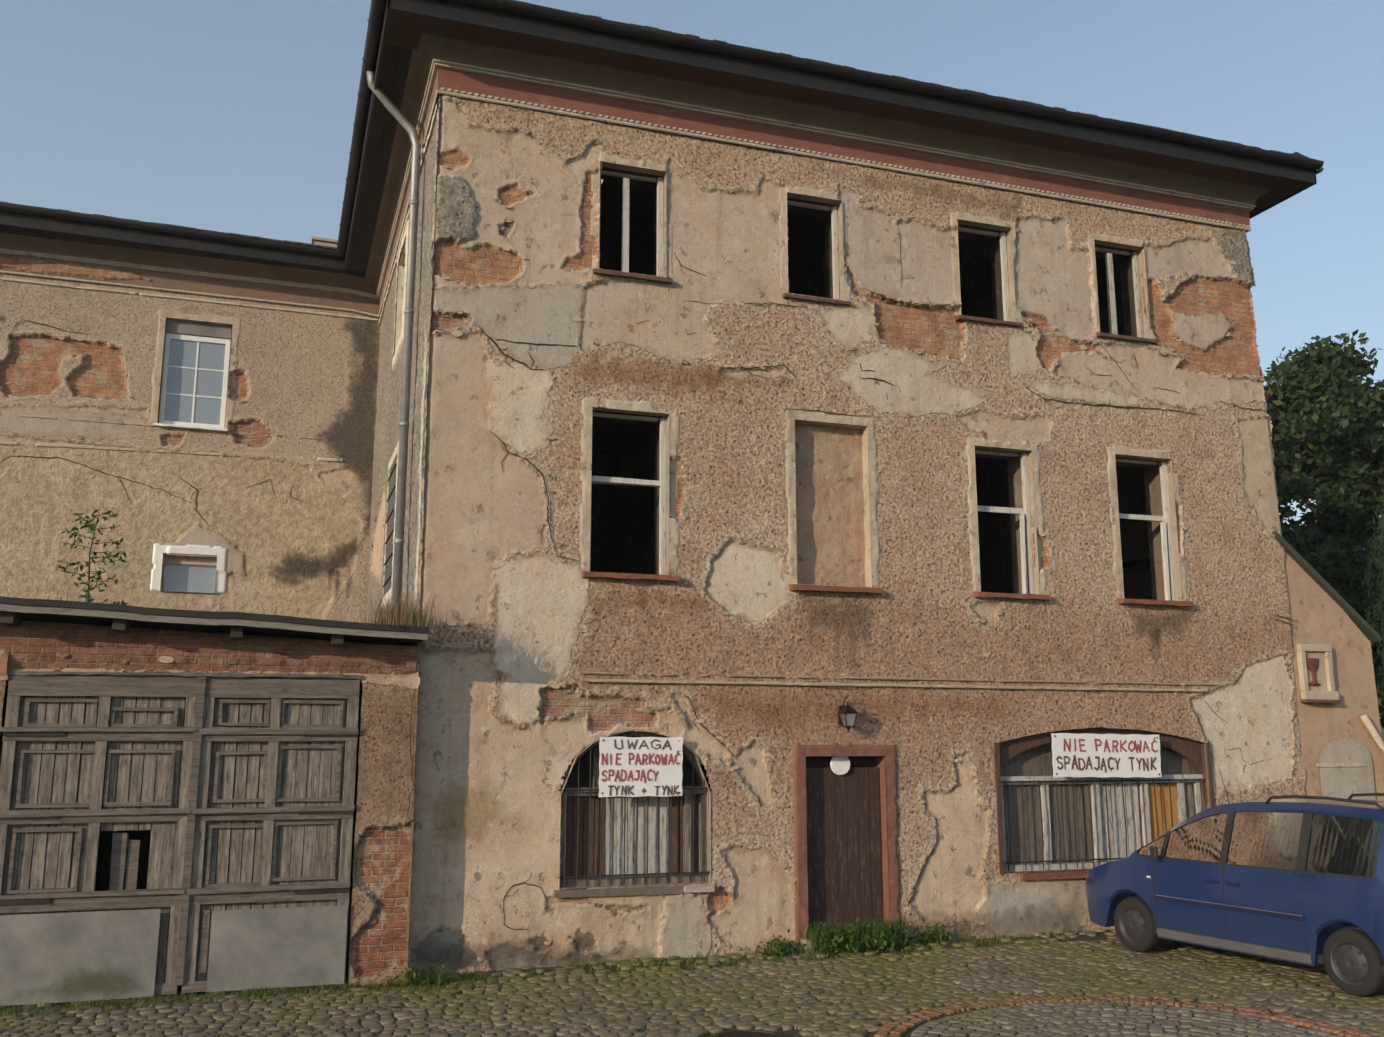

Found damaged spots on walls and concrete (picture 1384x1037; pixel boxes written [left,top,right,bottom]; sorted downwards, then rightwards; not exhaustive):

crack [0,452,209,526]
peeling [0,335,386,619]
damp [318,316,380,521]
crack [489,430,578,561]
peeling [428,99,791,379]
crack [720,349,897,416]
peeling [838,184,965,359]
crack [868,223,949,307]
peeling [1012,216,1269,416]
crack [1027,346,1264,417]
peeling [0,643,797,979]
peeling [1190,655,1295,795]